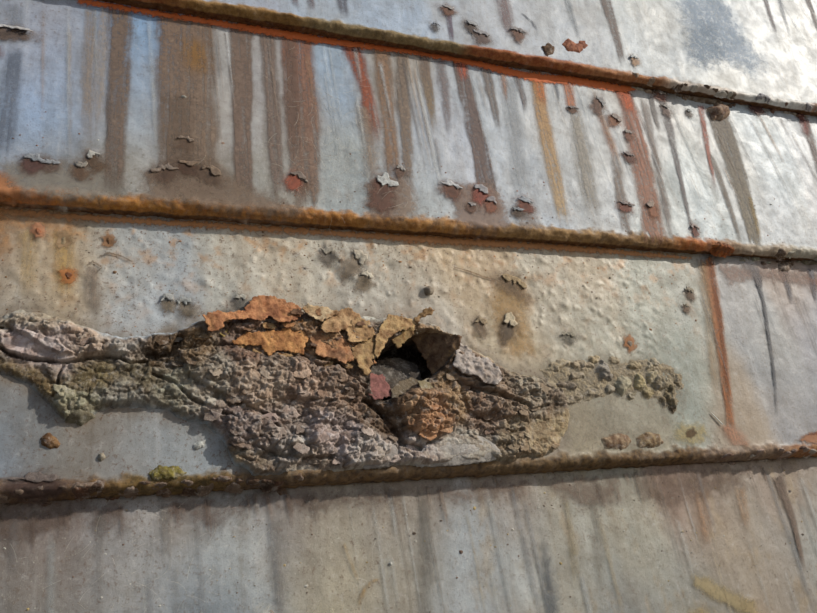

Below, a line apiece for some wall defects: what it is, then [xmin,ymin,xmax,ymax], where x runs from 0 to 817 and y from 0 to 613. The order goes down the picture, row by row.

damp [0,53,21,142]
rust [0,0,760,285]
rust [769,102,817,167]
peeling [369,165,407,215]
peeling [441,180,463,200]
peeling [466,184,497,213]
peeling [512,196,534,217]
spalling [0,293,570,476]
peeling [562,331,576,343]
rust [701,248,817,465]
peeling [0,471,71,503]
rust [775,475,804,559]